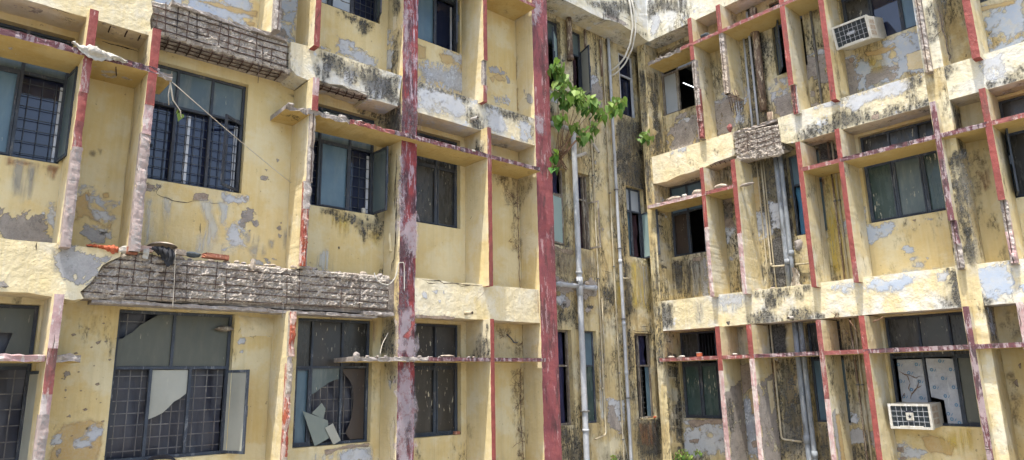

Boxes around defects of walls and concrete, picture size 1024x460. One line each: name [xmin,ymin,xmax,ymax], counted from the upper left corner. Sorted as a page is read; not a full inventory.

spalling [102,0,298,81]
water stain [317,31,418,131]
peeling [319,2,465,117]
spalling [666,33,799,168]
peeling [806,0,934,111]
peeling [980,0,1024,80]
water stain [949,105,987,265]
spalling [0,113,454,460]
water stain [601,53,705,460]
water stain [747,157,839,460]
peeling [978,200,1024,300]
water stain [561,427,584,460]